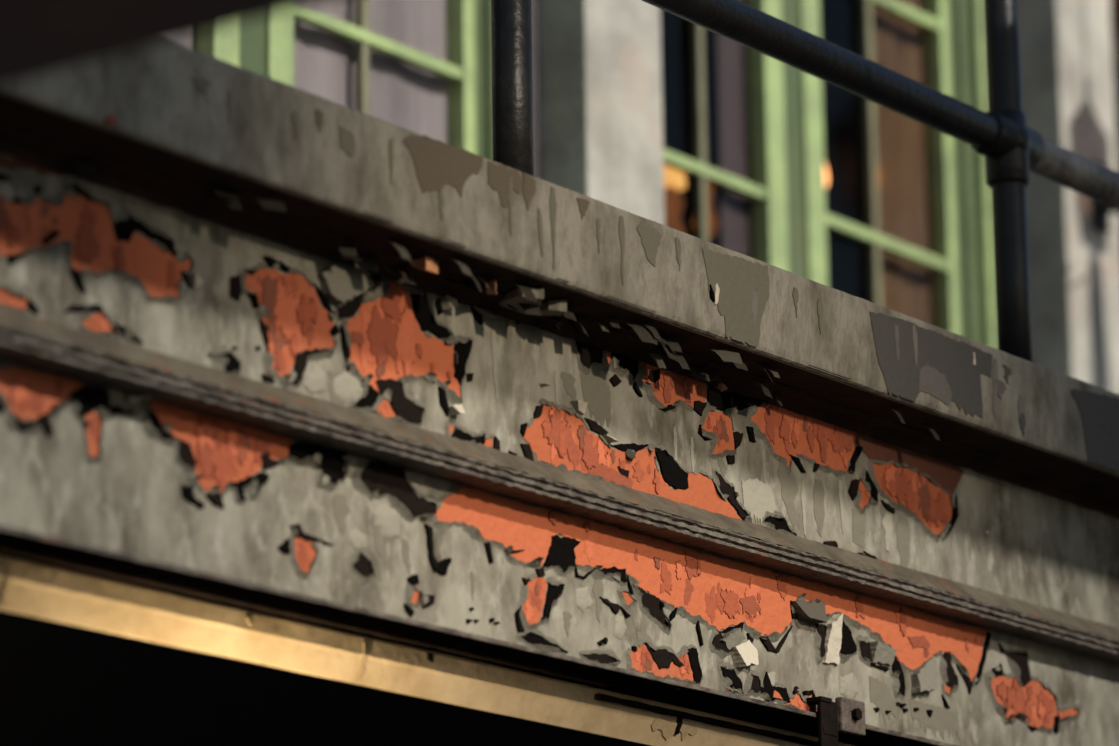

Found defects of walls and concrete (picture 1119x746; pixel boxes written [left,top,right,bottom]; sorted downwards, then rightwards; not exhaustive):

peeling [0,367,349,509]
spalling [216,346,241,372]
peeling [229,241,964,536]
peeling [278,523,324,573]
spalling [353,552,374,577]
peeling [360,461,1079,734]